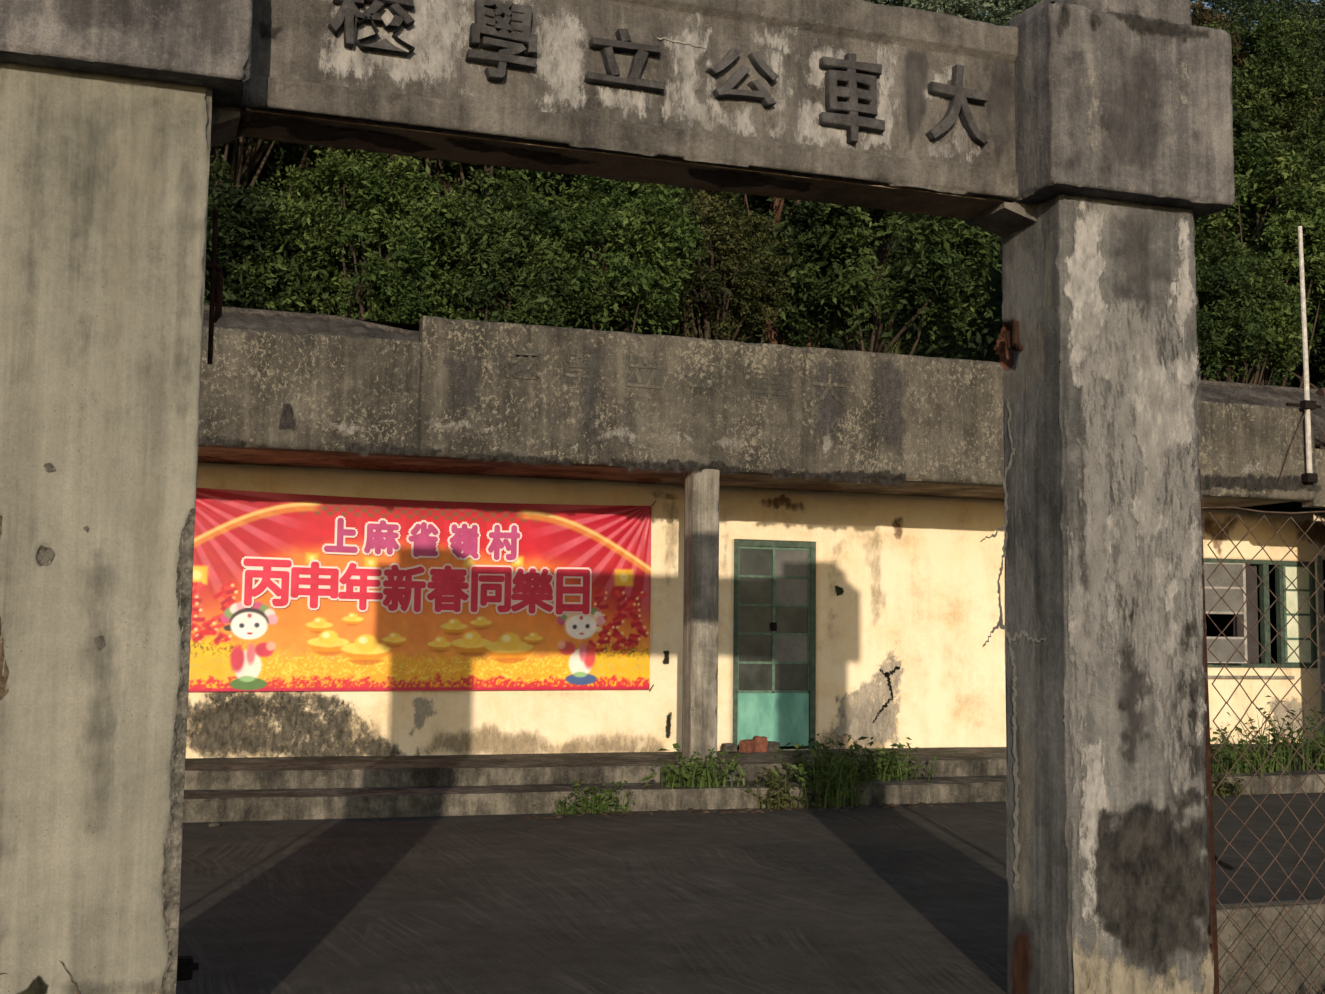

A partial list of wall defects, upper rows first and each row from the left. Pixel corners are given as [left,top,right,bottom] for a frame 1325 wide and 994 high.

peeling [319,0,480,96]
peeling [507,0,900,150]
peeling [923,56,952,100]
water stain [1117,222,1170,320]
water stain [186,691,660,758]
crack [872,666,900,723]
crack [980,397,1047,891]
peeling [1004,551,1038,737]
water stain [1118,589,1151,762]
peeling [1063,201,1214,994]
water stain [1095,620,1212,976]
water stain [1271,699,1304,741]